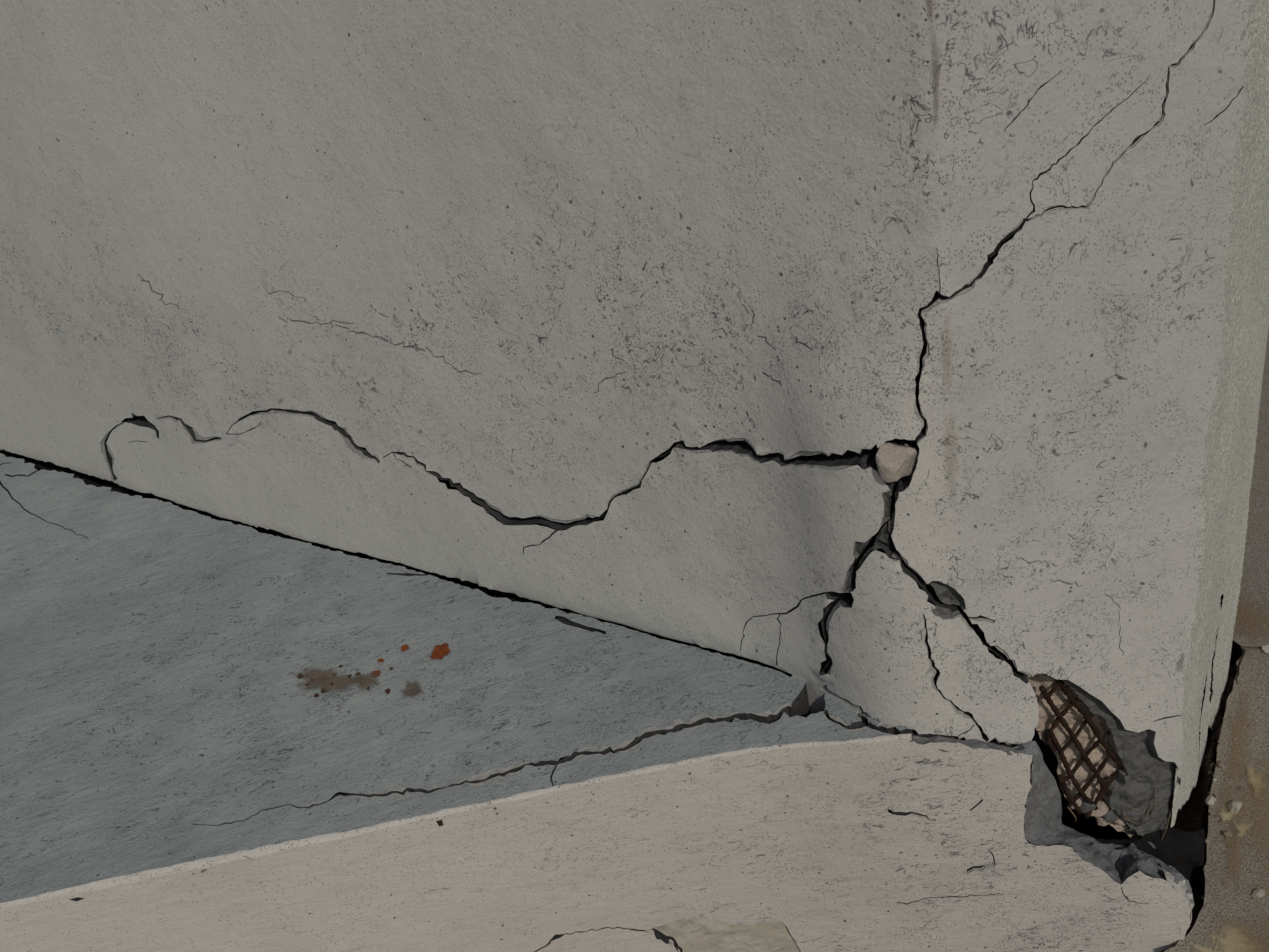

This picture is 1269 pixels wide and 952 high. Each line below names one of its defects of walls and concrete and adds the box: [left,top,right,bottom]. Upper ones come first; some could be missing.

crack [1204,86,1244,125]
crack [0,0,1215,684]
corrosion [430,643,451,659]
corrosion [297,658,422,698]
crack [192,614,1023,826]
spalling [1015,673,1181,848]
peeling [550,917,801,952]